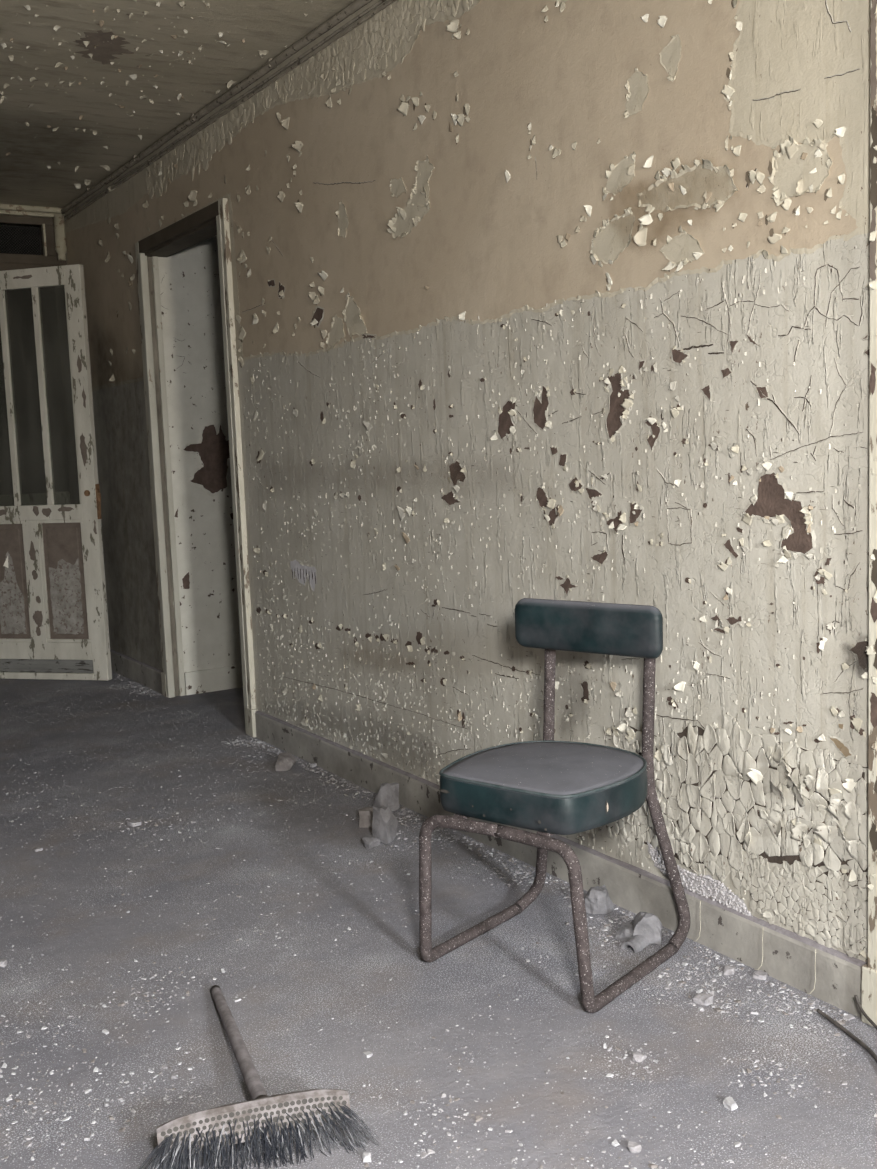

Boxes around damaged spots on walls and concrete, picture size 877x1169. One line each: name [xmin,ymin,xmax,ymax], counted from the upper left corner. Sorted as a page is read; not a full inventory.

crack [825,0,852,32]
peeling [0,0,473,239]
peeling [557,119,849,291]
crack [624,263,868,461]
crack [517,384,602,434]
peeling [181,422,230,497]
crack [591,531,625,564]
crack [657,469,693,547]
spalling [697,441,848,597]
crack [796,491,863,536]
spalling [693,601,751,636]
flaking render [595,681,877,959]